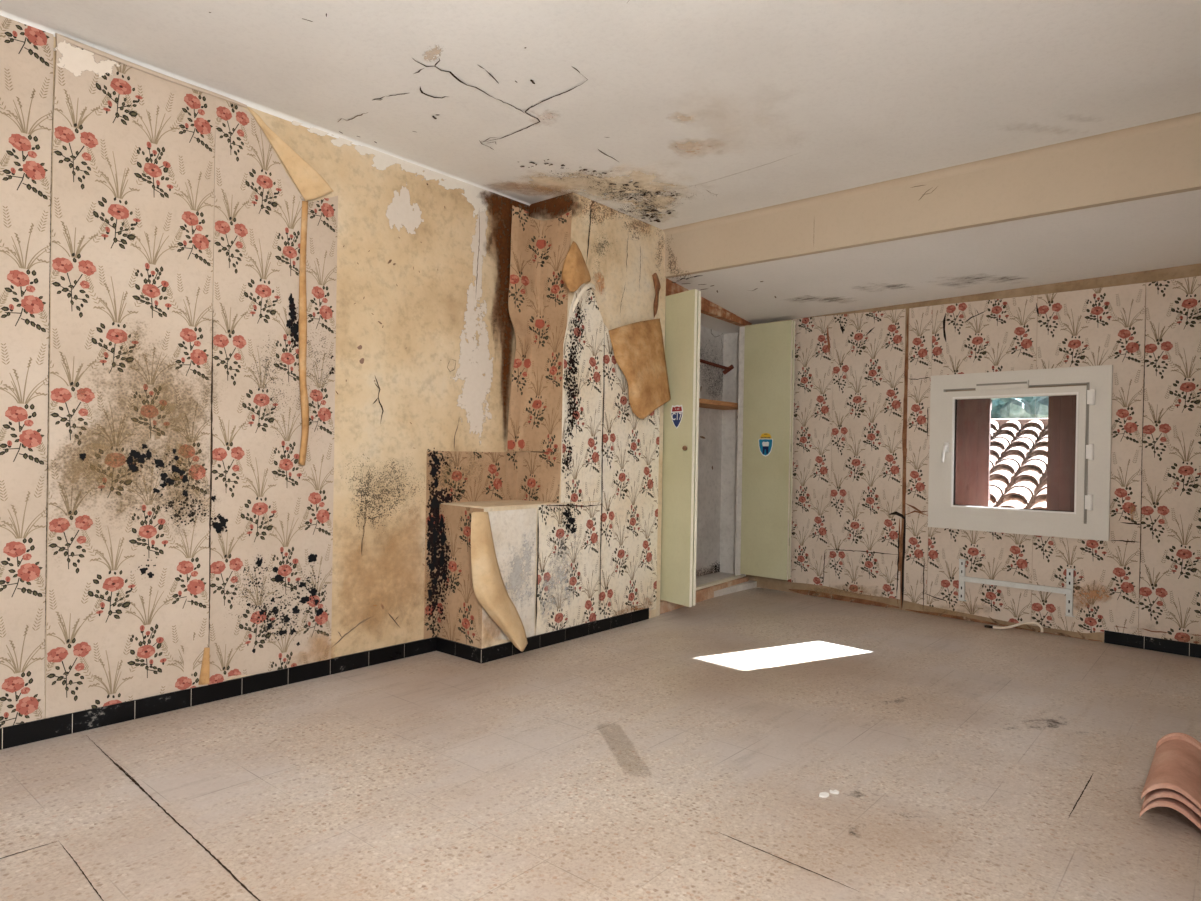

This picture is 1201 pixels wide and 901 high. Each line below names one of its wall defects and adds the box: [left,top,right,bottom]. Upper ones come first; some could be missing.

crack [338,59,588,149]
leakage [520,159,704,279]
leakage [56,333,228,537]
leakage [227,553,331,653]
leakage [340,448,481,637]
flaking render [488,508,537,637]
crack [0,841,104,901]
crack [86,735,261,901]
crack [716,831,857,891]
crack [1069,774,1093,817]